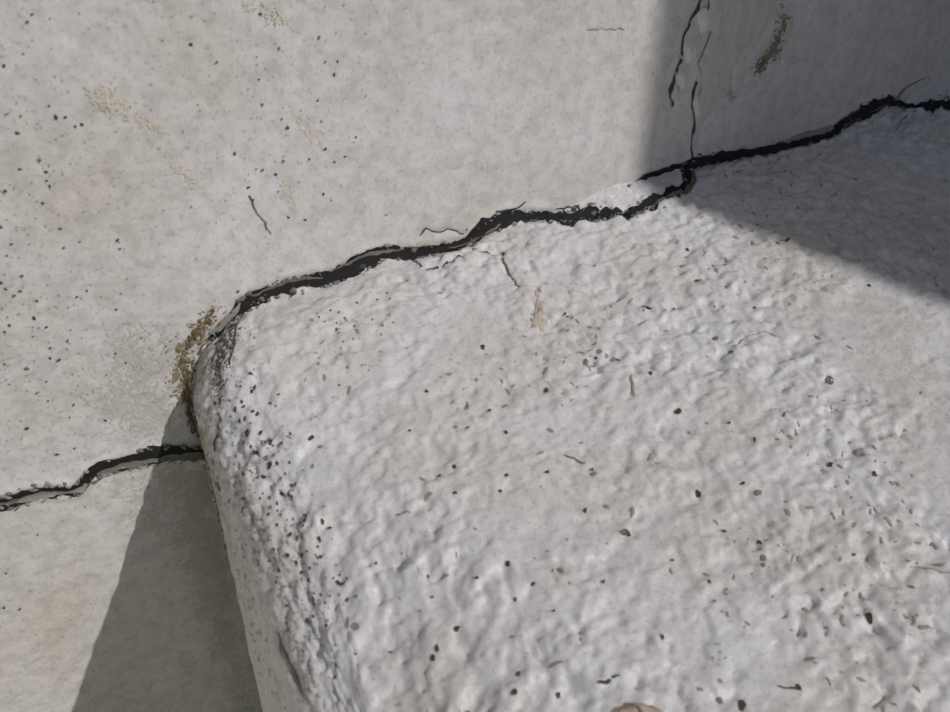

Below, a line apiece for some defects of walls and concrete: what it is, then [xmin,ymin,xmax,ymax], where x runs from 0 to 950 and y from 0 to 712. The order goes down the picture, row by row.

crack [0,0,950,512]
water stain [75,317,201,450]
water stain [97,460,263,712]
crack [598,674,620,684]